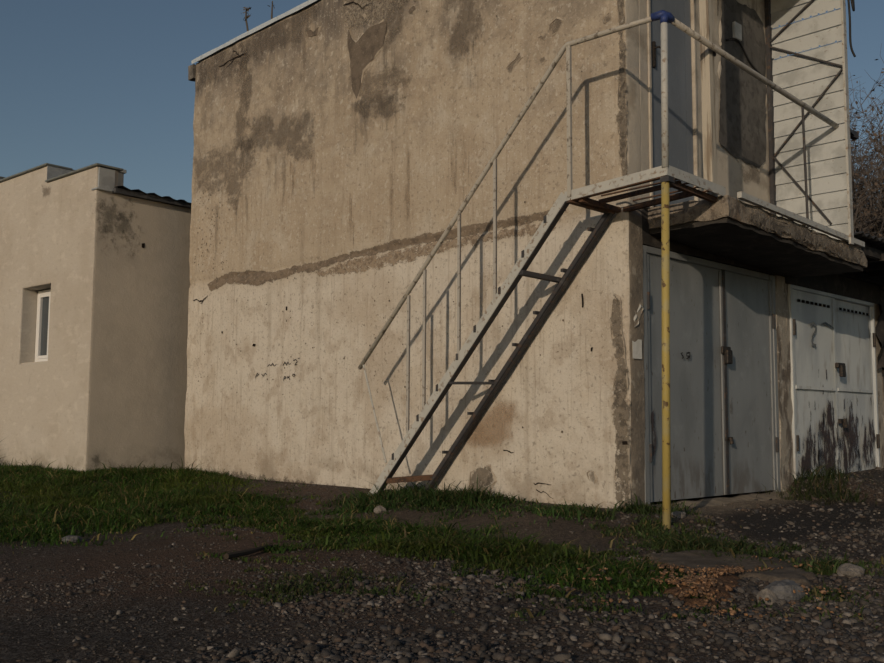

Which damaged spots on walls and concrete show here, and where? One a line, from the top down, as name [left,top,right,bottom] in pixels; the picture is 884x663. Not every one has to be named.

peeling [342,0,427,103]
flaking render [194,185,550,291]
flaking render [469,464,497,492]